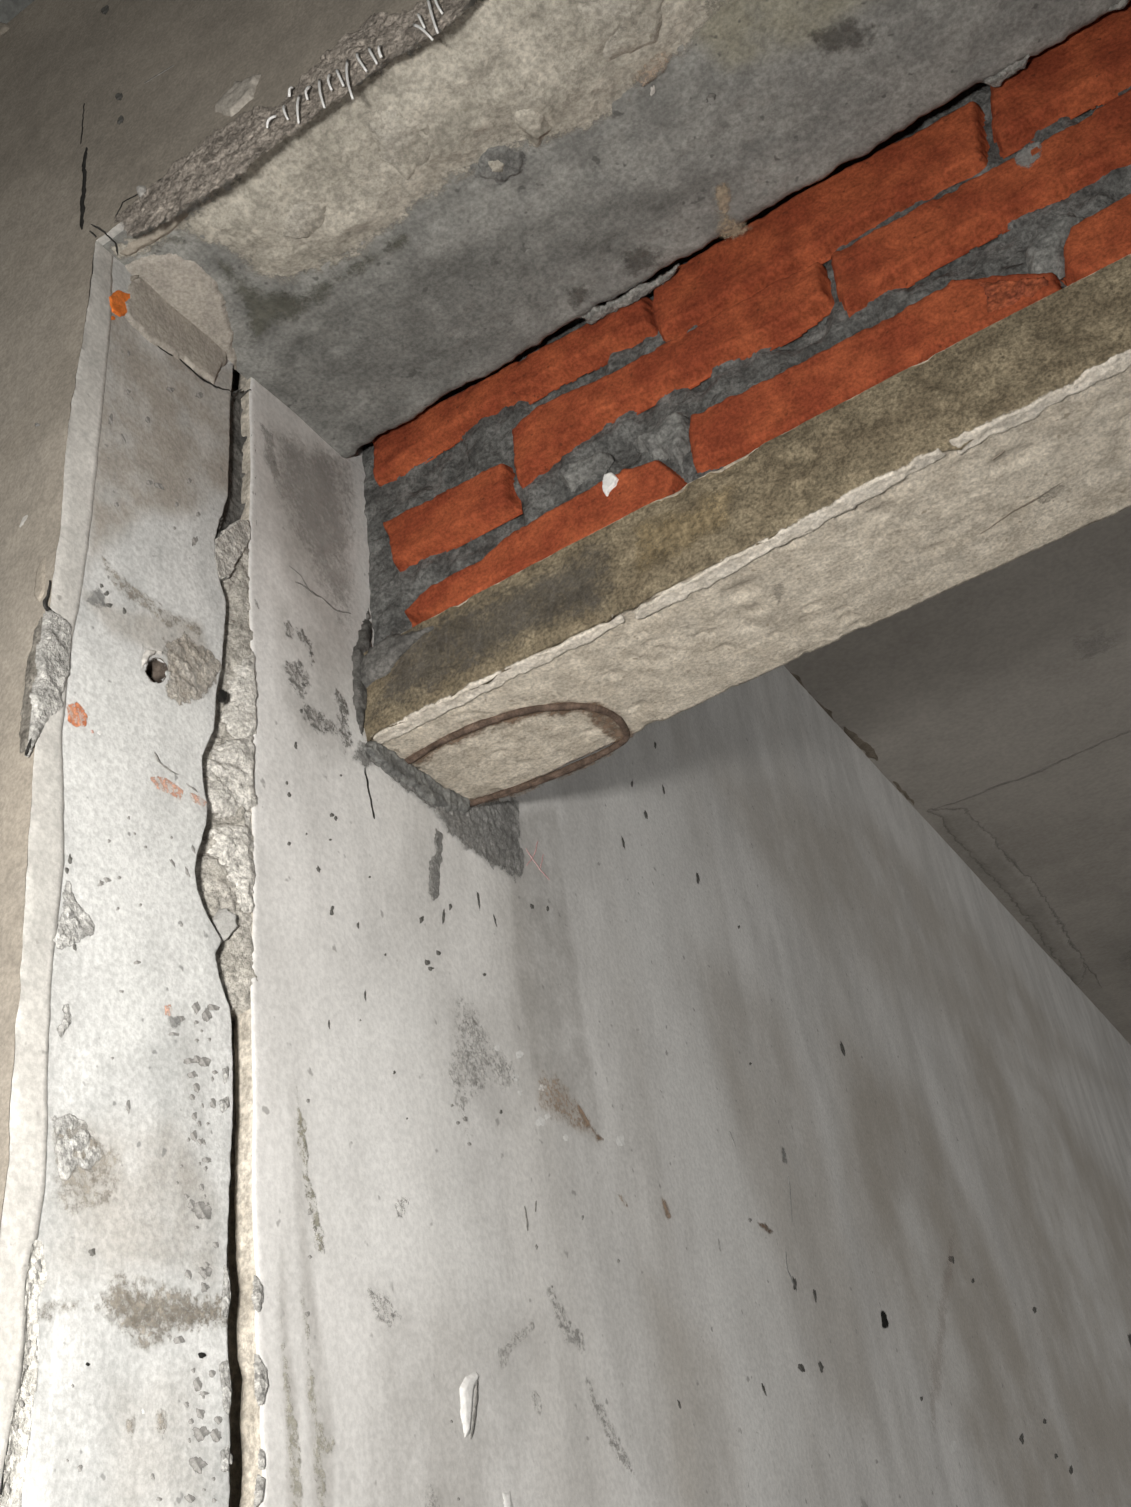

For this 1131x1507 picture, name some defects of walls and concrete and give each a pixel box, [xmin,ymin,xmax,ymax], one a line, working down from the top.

crack [80,103,162,256]
spalling [115,0,470,256]
spalling [984,54,1030,87]
spalling [1107,0,1129,11]
spalling [580,264,679,325]
spalling [373,349,1131,744]
spalling [19,556,72,757]
spalling [169,389,258,1229]
crack [791,673,1131,810]
spalling [0,1240,47,1507]
spalling [174,1242,233,1502]